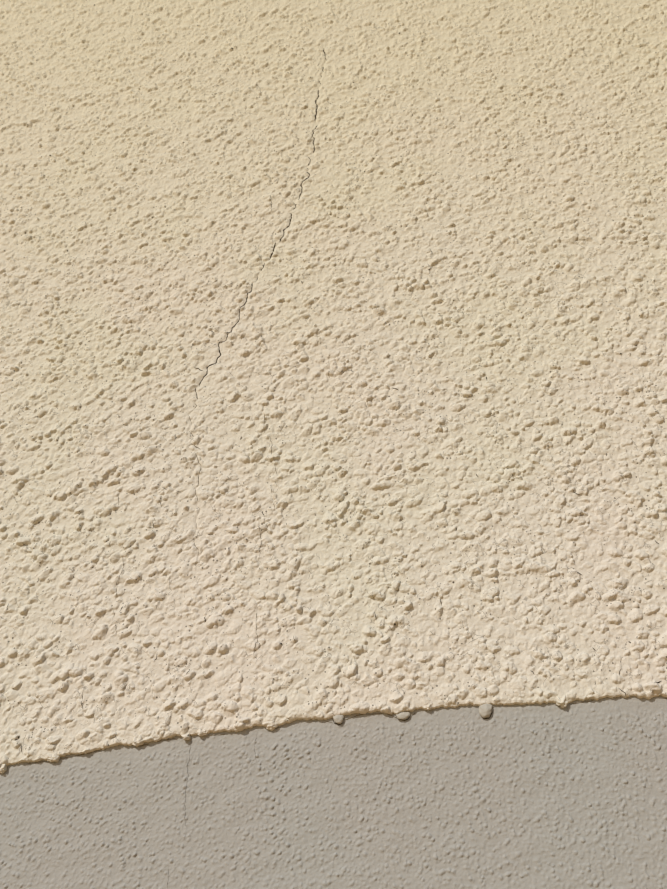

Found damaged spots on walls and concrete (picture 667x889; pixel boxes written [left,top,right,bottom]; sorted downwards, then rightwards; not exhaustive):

crack [189,48,326,525]